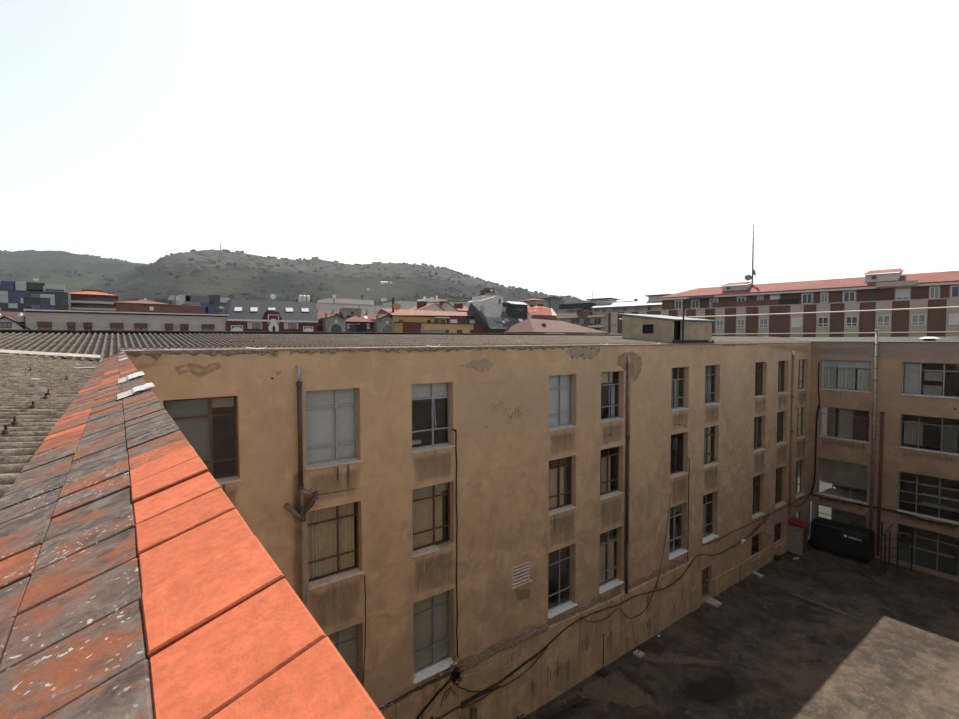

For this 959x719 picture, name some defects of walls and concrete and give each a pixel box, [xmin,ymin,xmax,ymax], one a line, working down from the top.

spalling [126,350,278,360]
peeling [290,346,600,372]